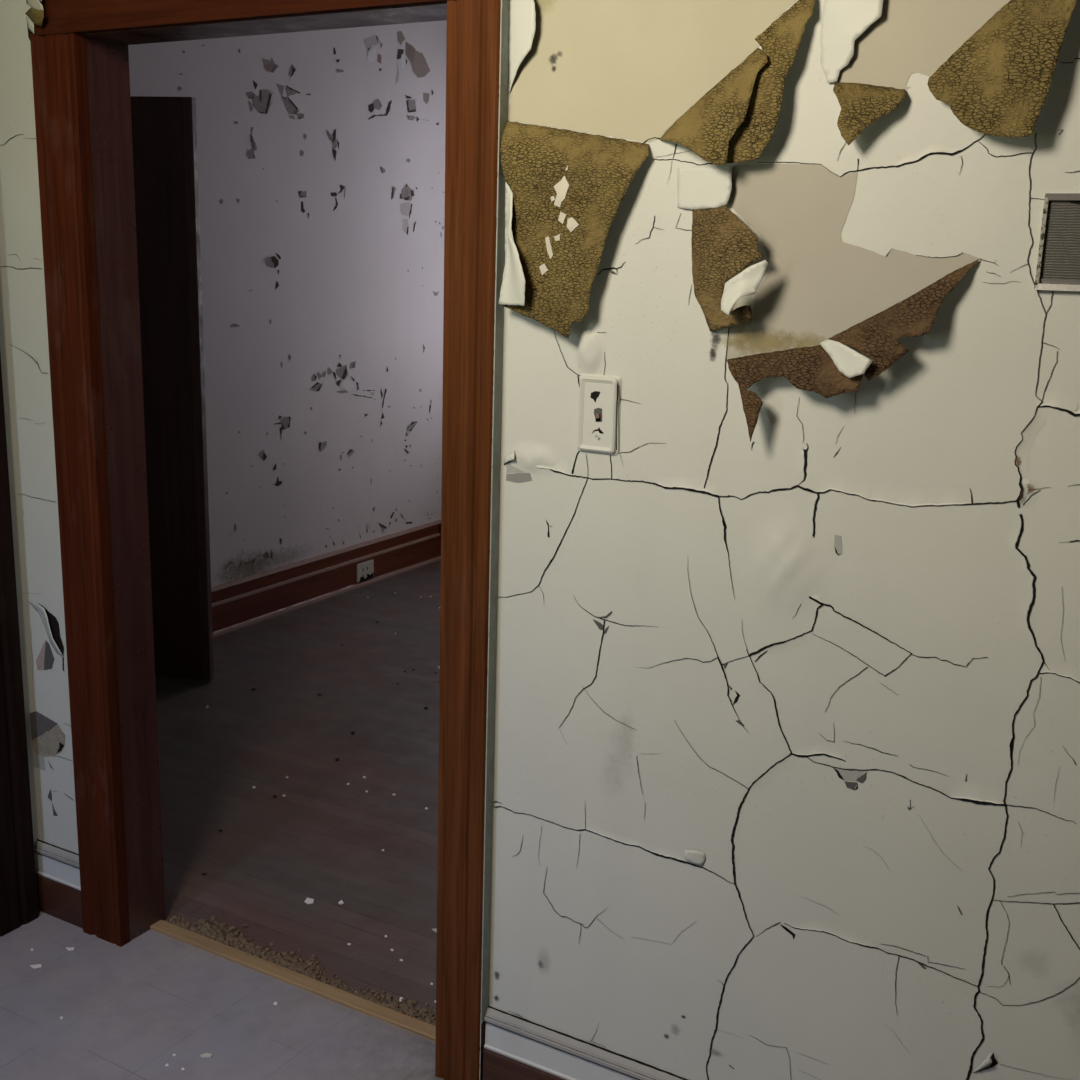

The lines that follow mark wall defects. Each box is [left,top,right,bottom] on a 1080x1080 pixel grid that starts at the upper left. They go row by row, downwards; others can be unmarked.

peeling [396,31,430,84]
peeling [246,56,310,120]
peeling [367,99,392,120]
peeling [405,91,439,125]
peeling [328,129,339,161]
peeling [391,184,418,235]
flaking render [499,0,1077,442]
peeling [262,253,281,290]
peeling [310,355,391,426]
peeling [28,601,63,670]
crack [493,133,1080,1080]
flaking render [30,711,65,771]